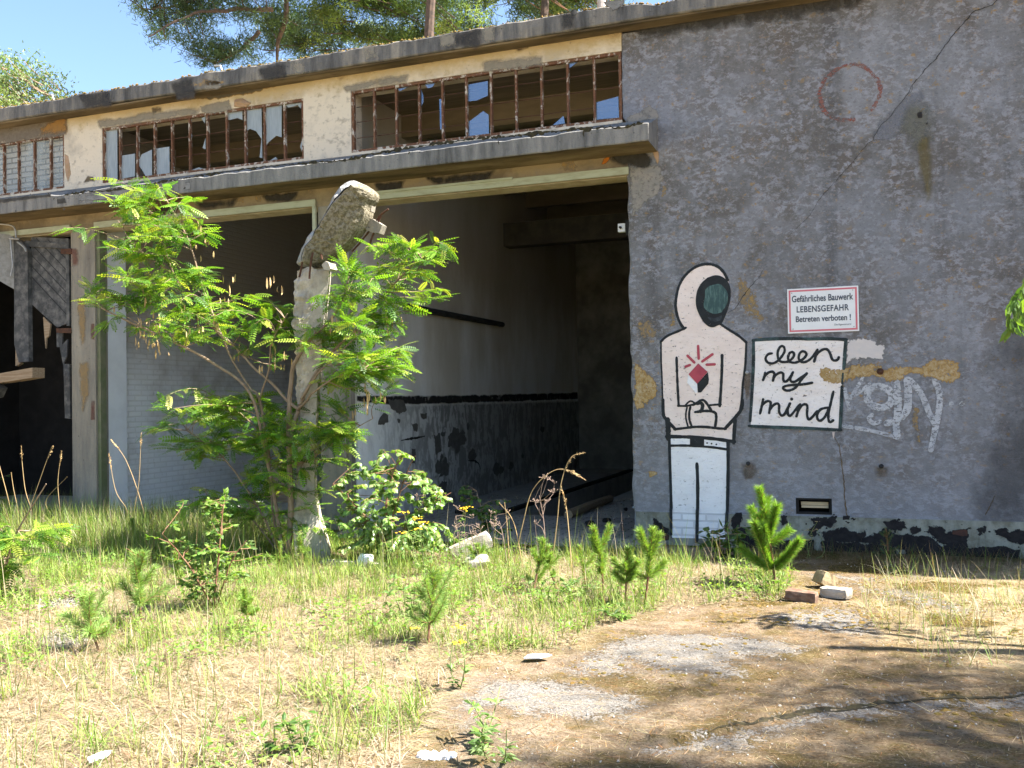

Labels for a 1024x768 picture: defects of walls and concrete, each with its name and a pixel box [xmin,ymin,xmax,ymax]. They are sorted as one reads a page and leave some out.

crack [783,0,997,245]
spalling [352,206,389,252]
peeling [634,363,660,410]
peeling [843,355,962,387]
peeling [378,399,427,432]
peeling [434,423,477,493]
peeling [772,514,1024,559]